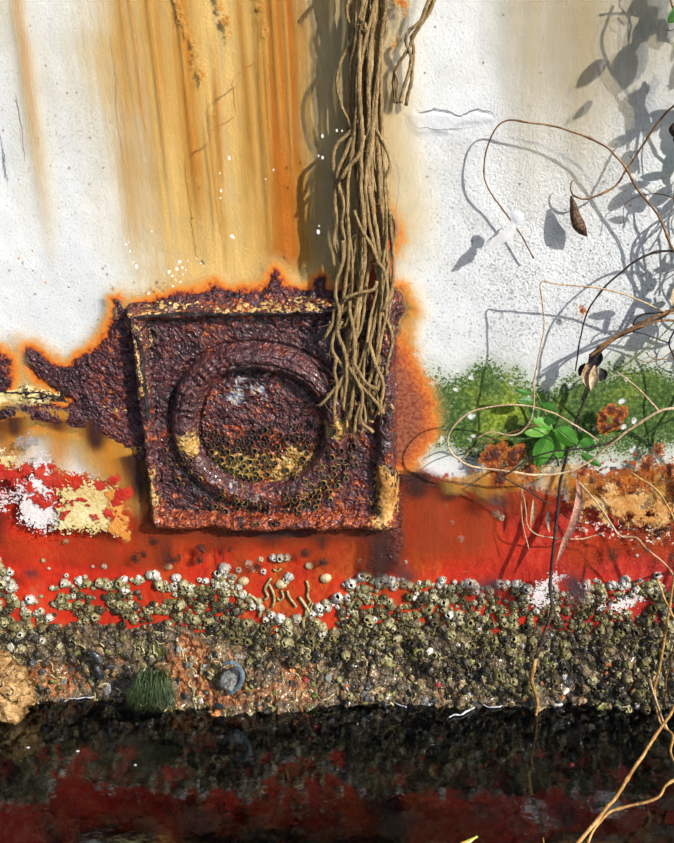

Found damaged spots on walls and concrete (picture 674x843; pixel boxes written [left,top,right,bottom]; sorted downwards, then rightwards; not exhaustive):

rust [0,0,558,576]
rust [597,403,629,435]
peeling [0,429,134,543]
rust [568,443,674,566]